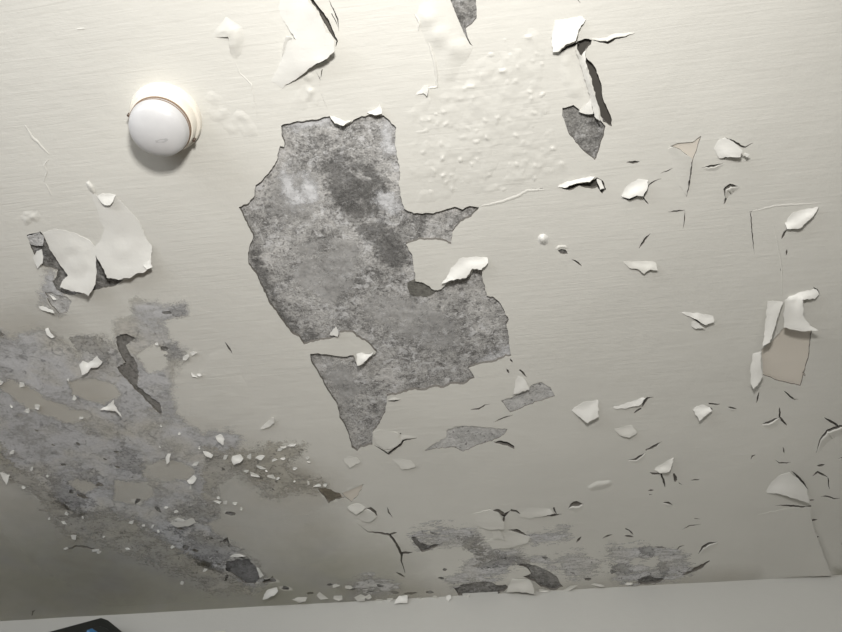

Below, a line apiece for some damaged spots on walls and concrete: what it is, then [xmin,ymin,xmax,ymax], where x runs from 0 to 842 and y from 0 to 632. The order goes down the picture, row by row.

peeling [271,0,335,88]
spalling [451,0,477,42]
spalling [551,16,611,158]
peeling [27,192,152,315]
spalling [241,104,514,468]
spalling [0,298,377,600]
spalling [502,376,554,411]
peeling [571,400,599,423]
crack [762,392,793,429]
crack [795,418,842,497]
crack [365,507,407,576]
spalling [292,508,693,604]